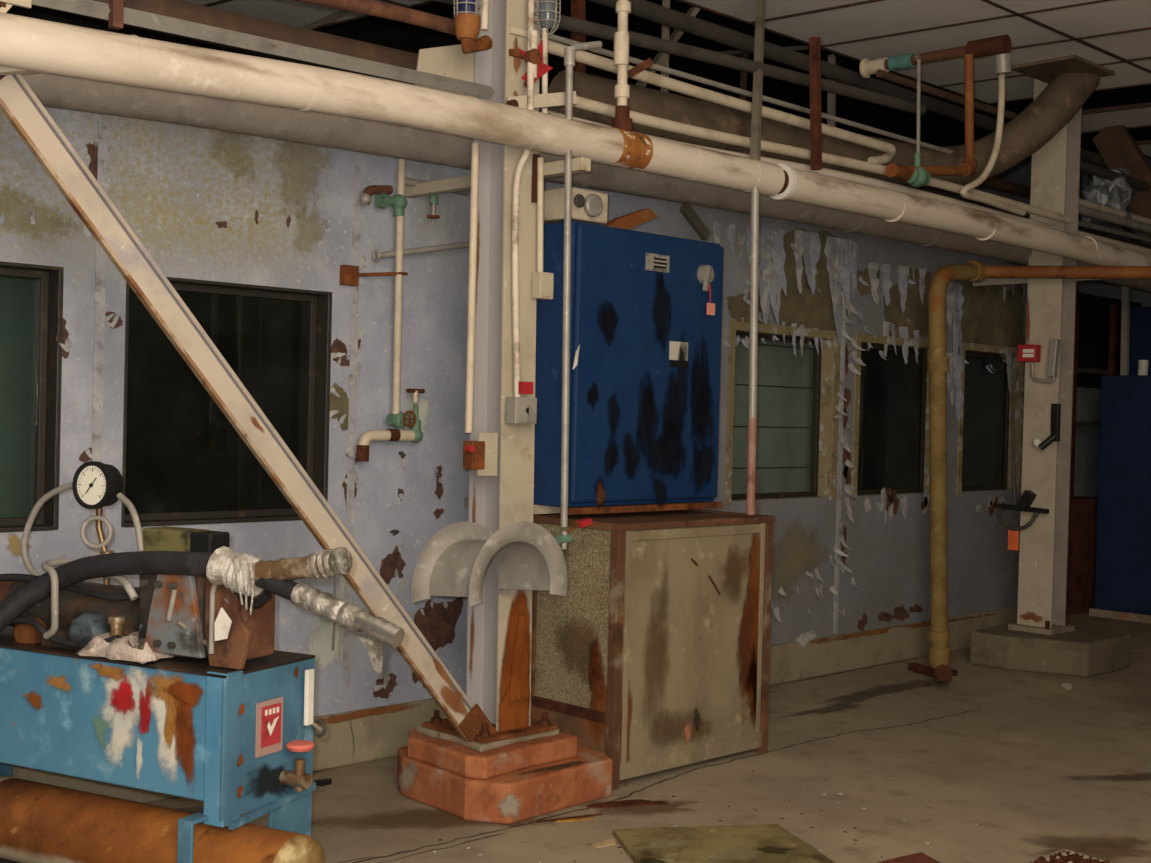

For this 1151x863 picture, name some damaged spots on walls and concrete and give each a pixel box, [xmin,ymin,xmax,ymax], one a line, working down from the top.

peeling [325,338,364,431]
peeling [721,228,931,565]
peeling [342,447,359,501]
peeling [380,545,406,585]
peeling [414,597,463,655]
peeling [857,604,924,631]
peeling [373,673,397,699]